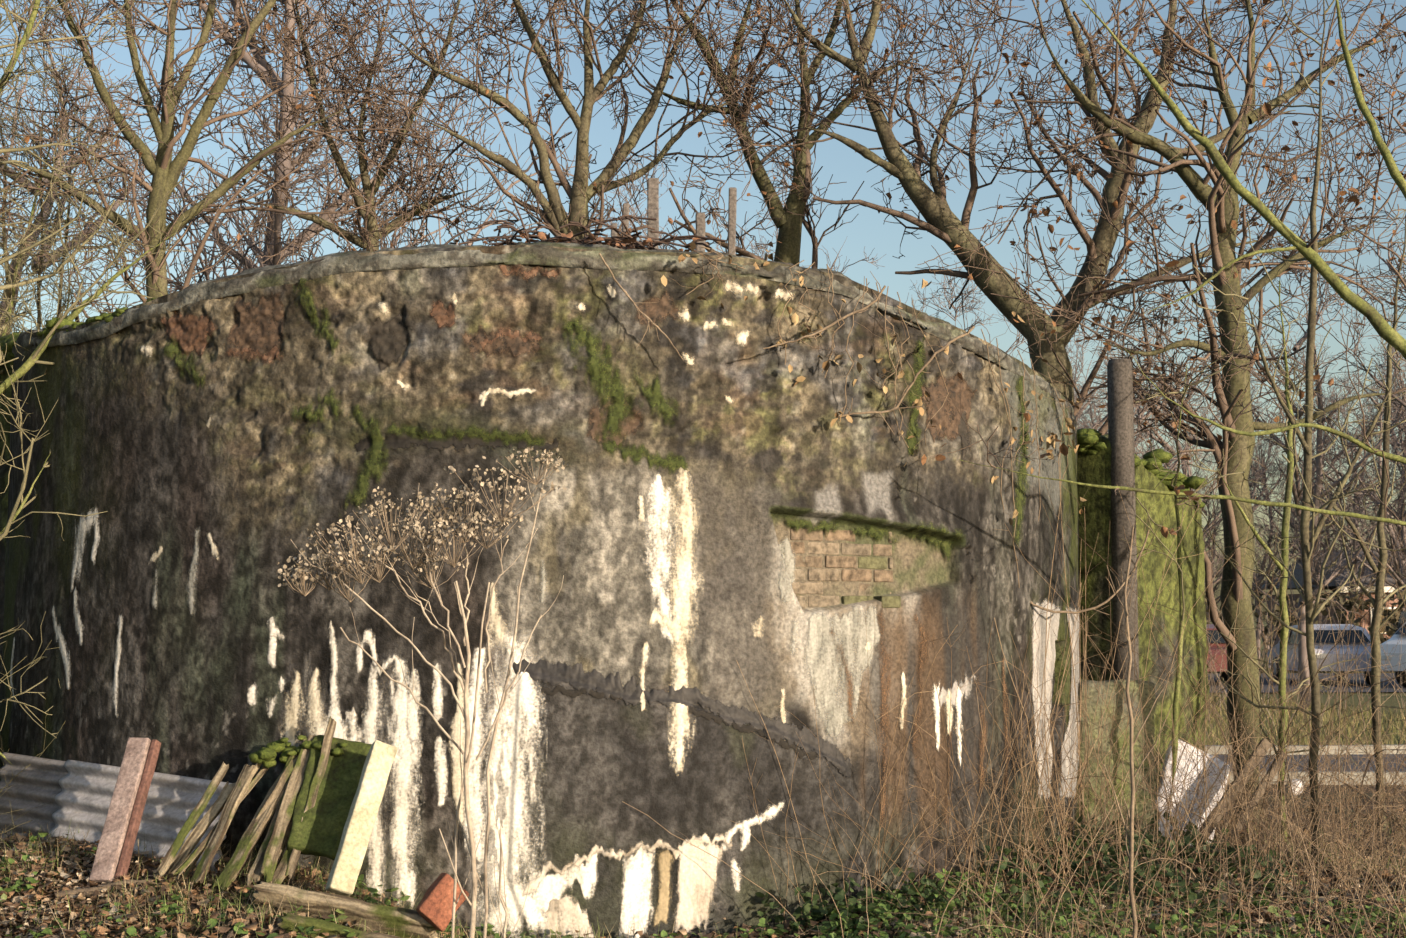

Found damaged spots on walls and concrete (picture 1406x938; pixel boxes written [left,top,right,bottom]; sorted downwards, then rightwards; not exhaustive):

damp [52,509,99,689]
damp [150,546,163,608]
damp [188,530,218,614]
damp [248,583,547,936]
damp [639,467,701,771]
spalling [778,538,795,603]
spalling [805,605,881,738]
damp [934,676,975,765]